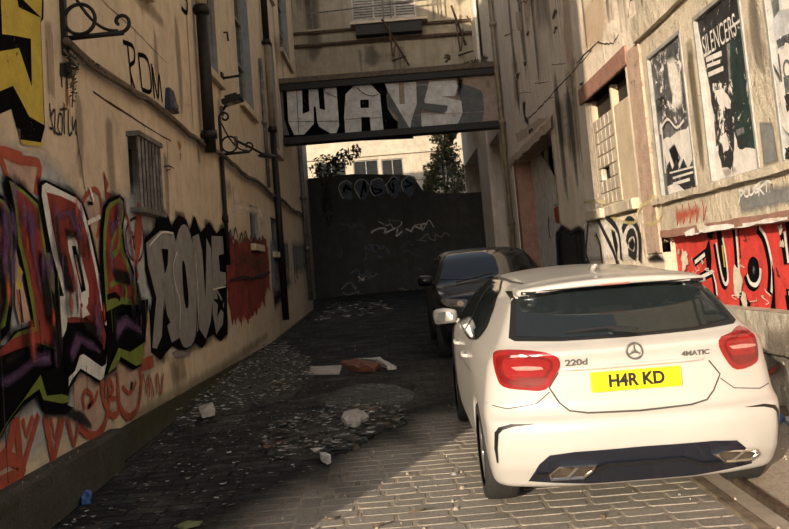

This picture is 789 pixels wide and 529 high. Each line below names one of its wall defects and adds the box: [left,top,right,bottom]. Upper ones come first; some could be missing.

crack [763,352,789,360]